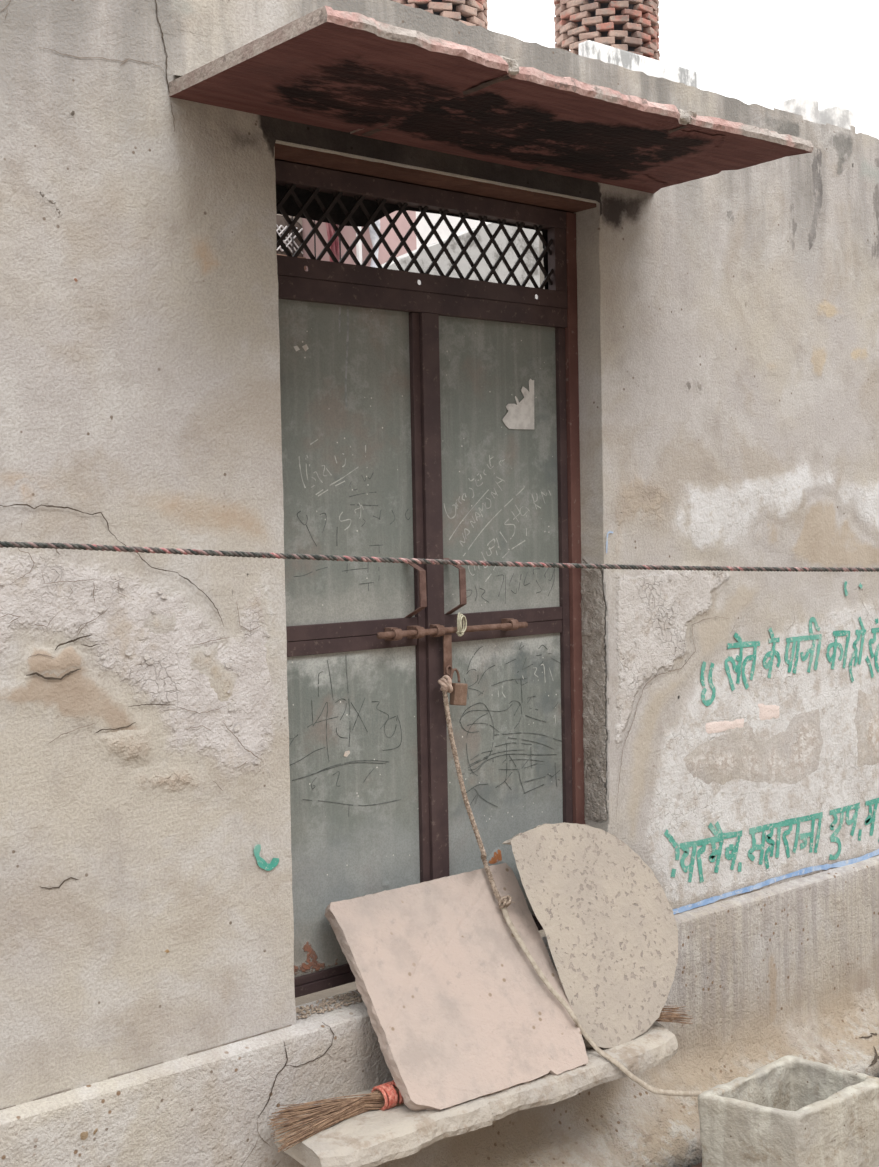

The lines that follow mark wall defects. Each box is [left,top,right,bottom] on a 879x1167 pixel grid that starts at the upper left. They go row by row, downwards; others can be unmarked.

crack [38,0,175,131]
water stain [753,108,879,267]
crack [0,504,262,680]
peeling [0,536,287,816]
crack [50,704,261,791]
peeling [581,554,879,915]
corrosion [294,917,343,978]
crack [241,1022,334,1167]